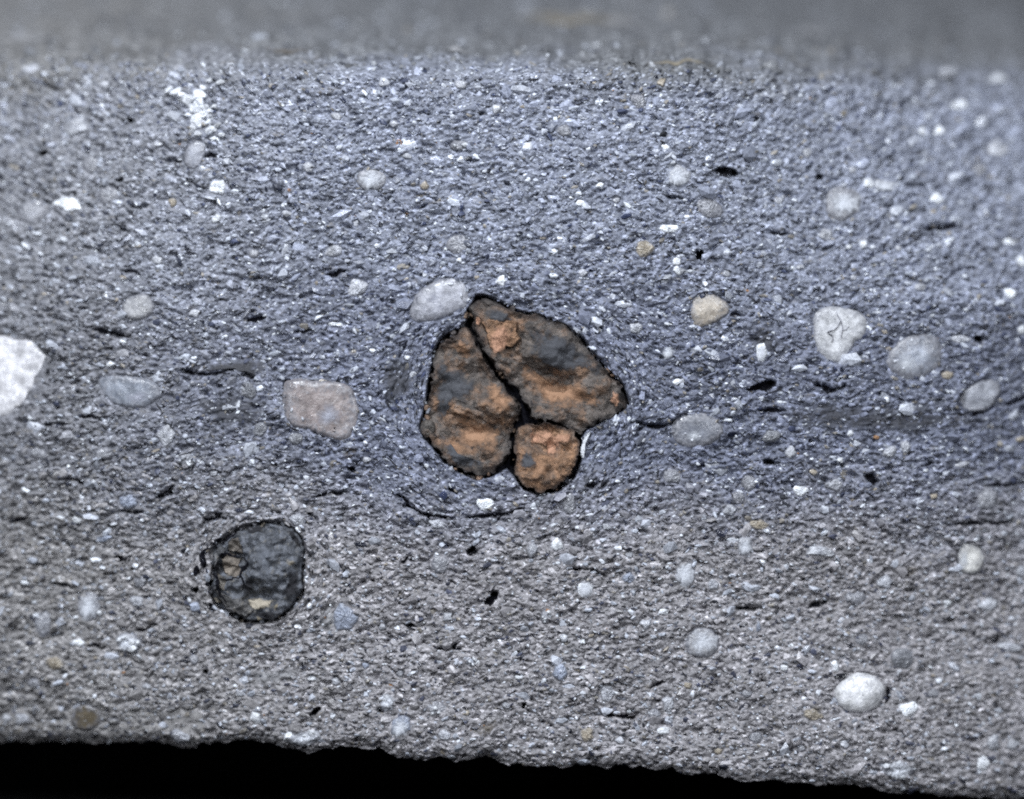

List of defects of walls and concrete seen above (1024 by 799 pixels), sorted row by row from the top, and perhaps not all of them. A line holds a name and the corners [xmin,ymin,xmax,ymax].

corrosion [491,327,510,353]
corrosion [488,384,509,409]
corrosion [524,366,596,408]
corrosion [459,418,499,448]
corrosion [530,430,570,475]